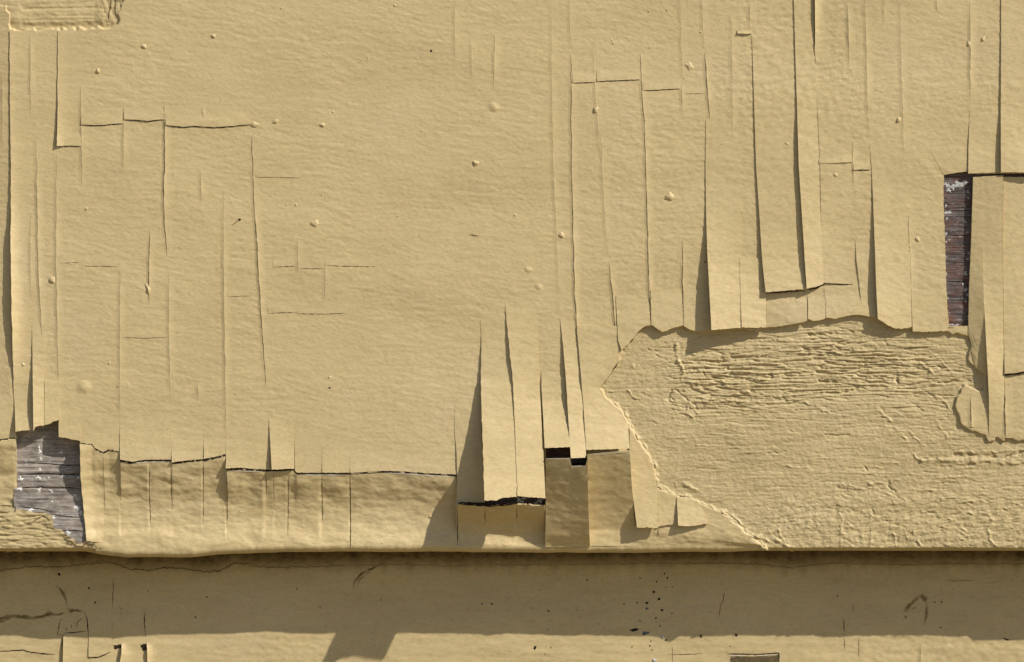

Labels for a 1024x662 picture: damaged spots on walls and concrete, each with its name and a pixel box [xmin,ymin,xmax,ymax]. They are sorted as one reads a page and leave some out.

crack [814,0,857,65]
crack [933,0,978,105]
crack [0,31,273,434]
crack [606,262,626,348]
crack [568,47,718,330]
peeling [541,0,1024,551]
crack [819,140,870,190]
peeling [0,303,635,551]
crack [967,378,1014,438]